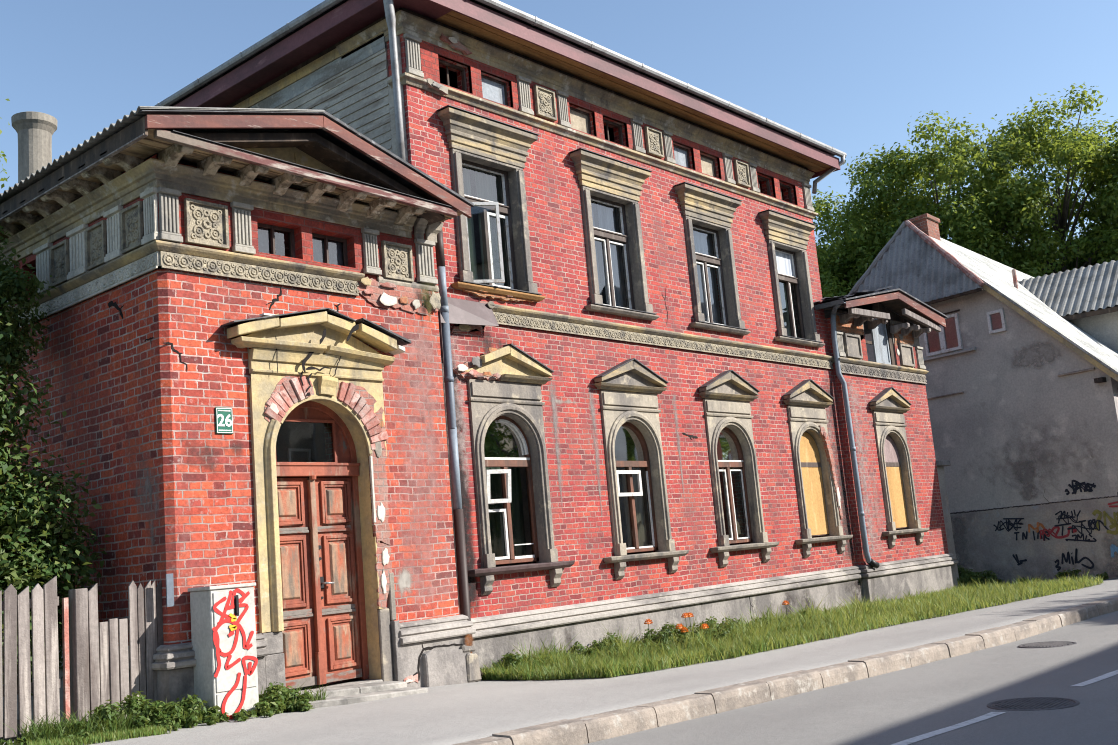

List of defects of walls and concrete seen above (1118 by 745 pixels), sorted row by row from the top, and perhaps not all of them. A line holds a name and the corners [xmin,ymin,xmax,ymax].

crack [108,301,124,319]
crack [266,287,282,310]
spalling [357,277,441,315]
crack [145,337,188,370]
crack [275,303,410,377]
spalling [336,381,392,608]
crack [413,643,463,681]